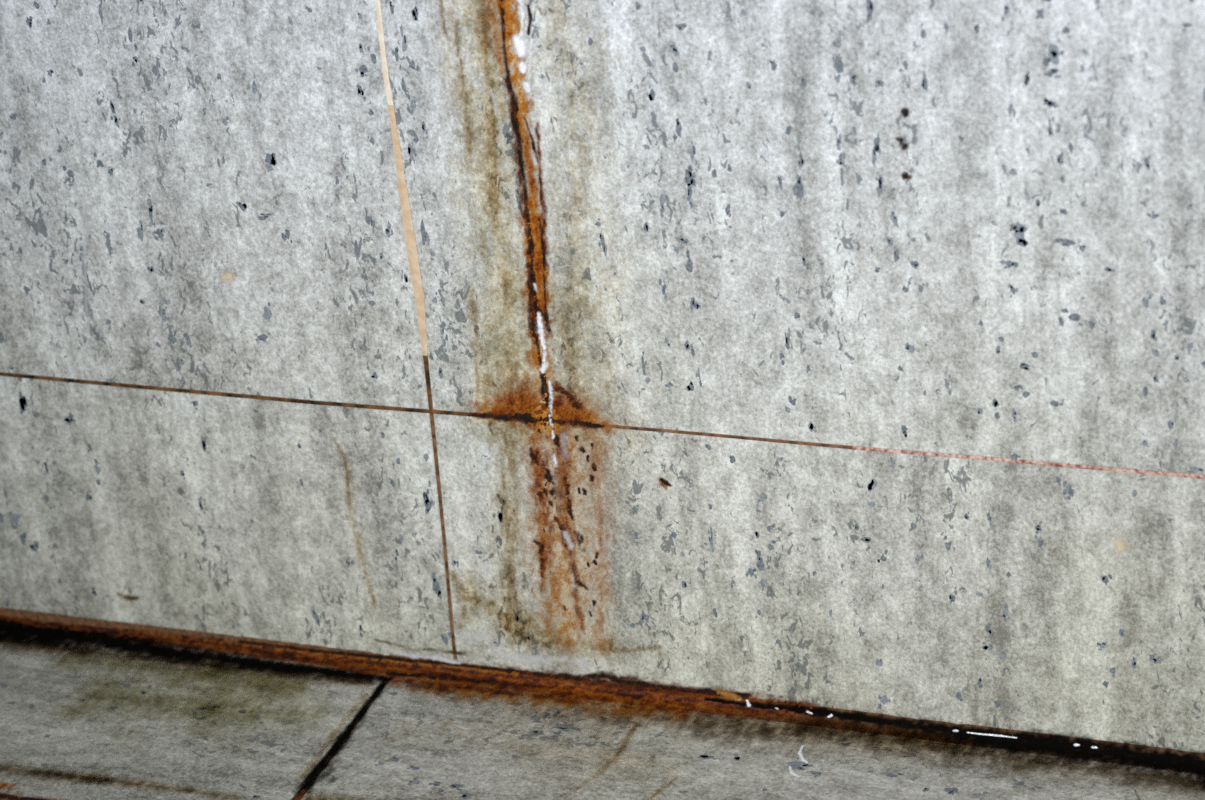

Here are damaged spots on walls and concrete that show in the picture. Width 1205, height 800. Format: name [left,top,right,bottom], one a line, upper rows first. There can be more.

damp [513,0,531,93]
crack [499,0,570,424]
rust [469,0,611,646]
rust [0,615,959,749]
rust [0,783,45,800]